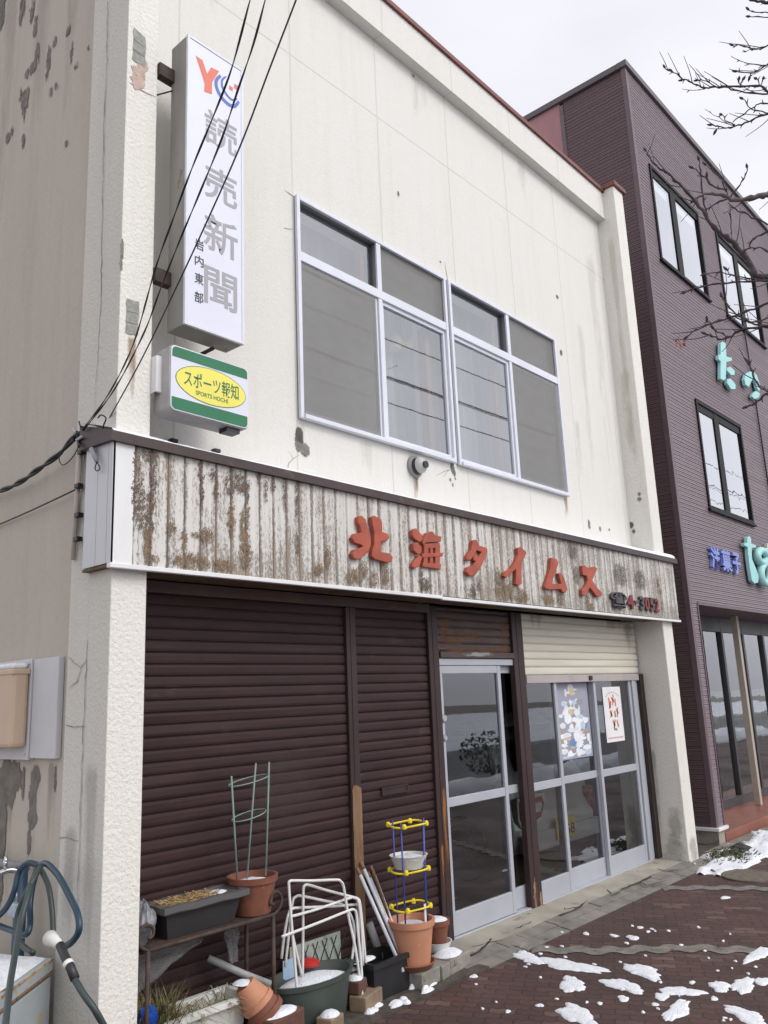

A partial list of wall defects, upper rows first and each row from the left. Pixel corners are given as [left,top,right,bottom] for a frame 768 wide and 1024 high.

peeling [295,429,310,457]
peeling [0,759,40,901]
crack [59,640,88,899]